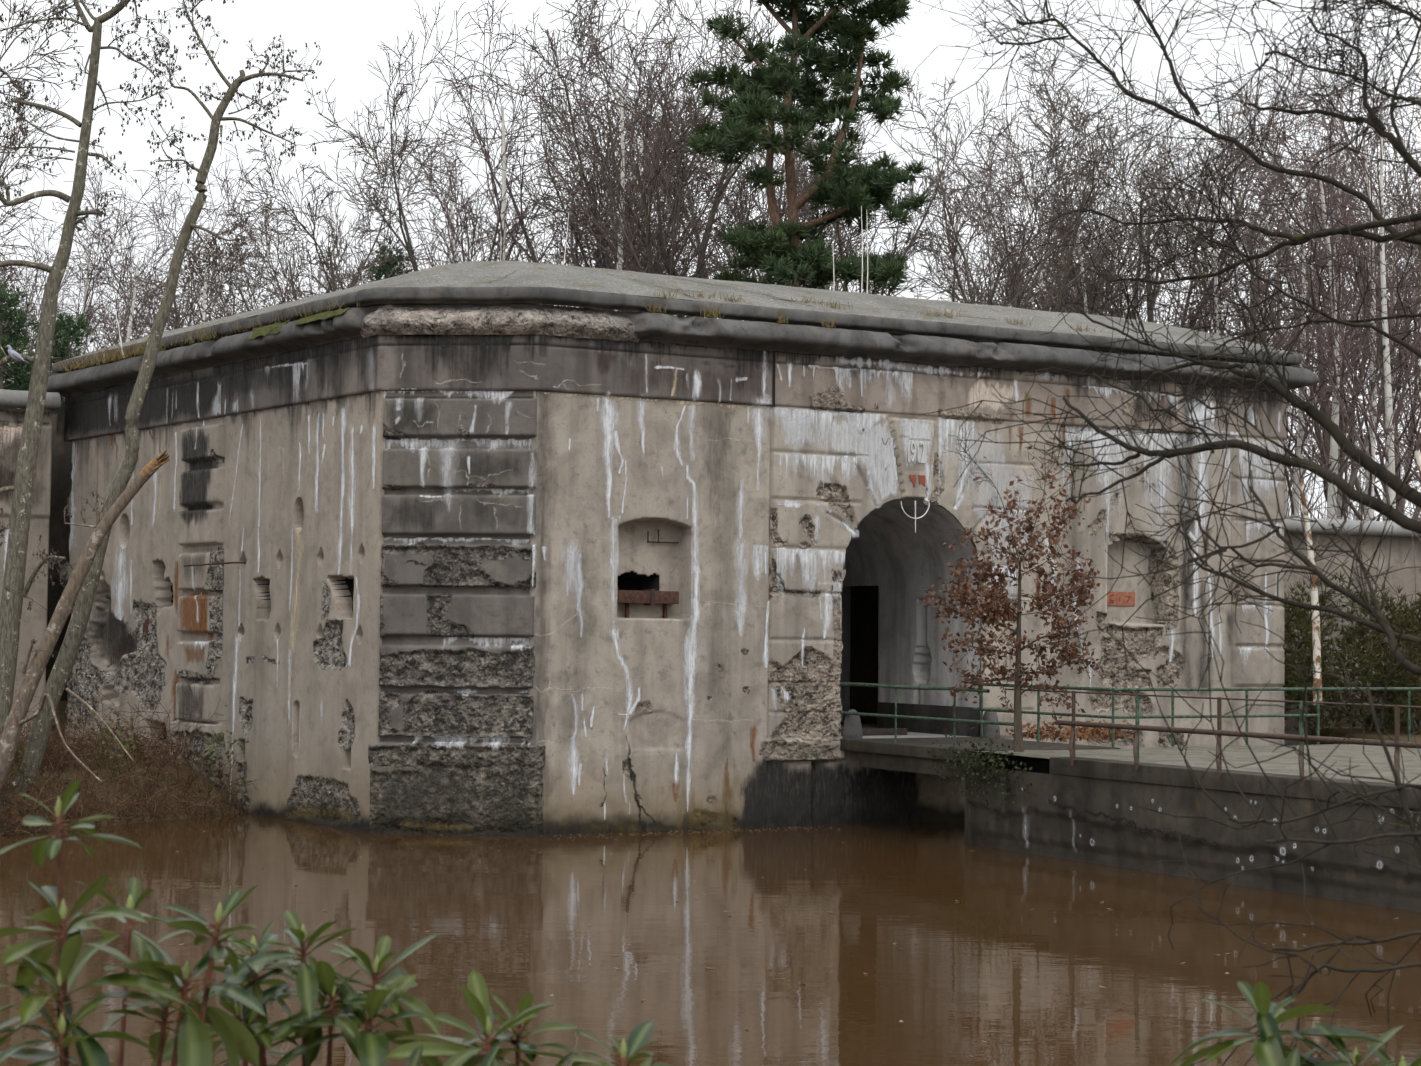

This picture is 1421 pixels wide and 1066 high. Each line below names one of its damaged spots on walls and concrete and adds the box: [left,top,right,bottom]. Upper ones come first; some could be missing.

spalling [65,547,224,730]
spalling [285,543,546,836]
crack [600,628,655,828]
damp [43,334,1283,836]
spalling [759,507,846,763]
spalling [816,480,858,528]